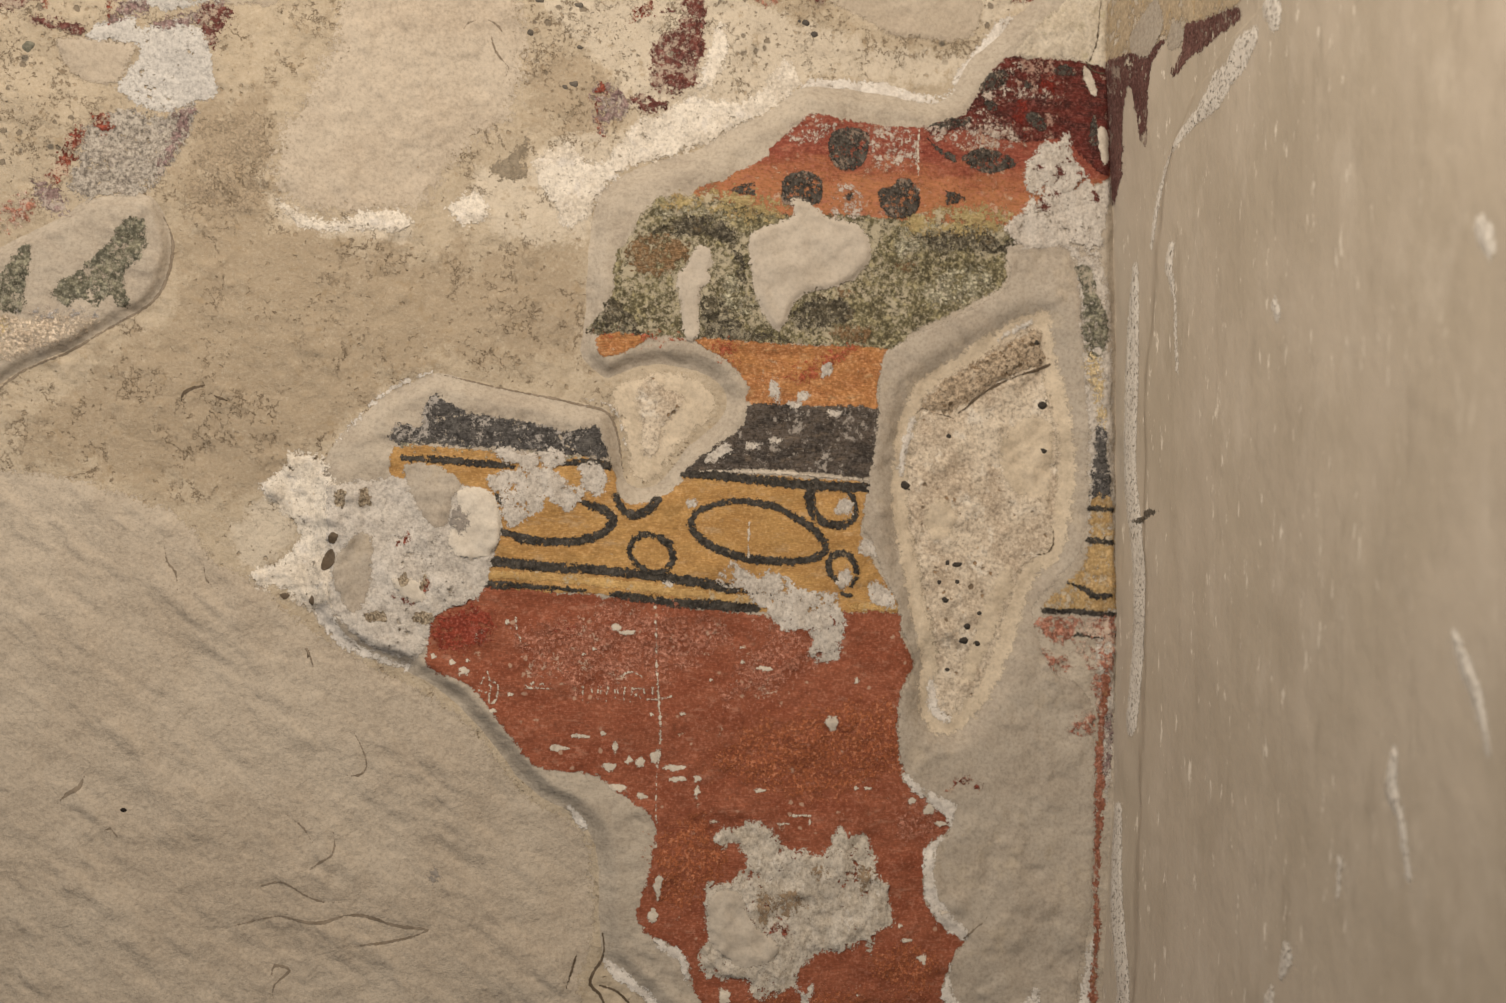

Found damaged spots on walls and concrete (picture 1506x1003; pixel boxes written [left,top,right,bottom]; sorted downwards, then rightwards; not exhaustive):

spalling [608,369,719,483]
spalling [889,308,1079,736]
spalling [248,448,503,676]
peeling [611,623,635,635]
peeling [824,716,839,731]
peeling [550,731,702,800]
peeling [909,797,949,827]
peeling [647,876,664,924]
spalling [697,814,926,1003]